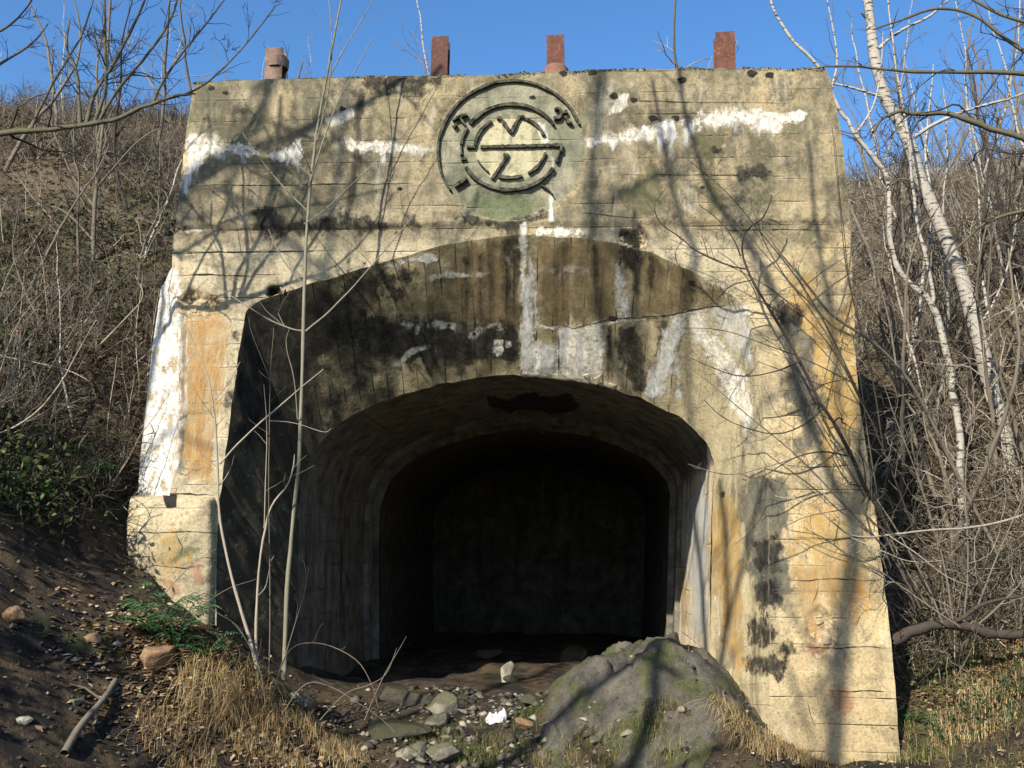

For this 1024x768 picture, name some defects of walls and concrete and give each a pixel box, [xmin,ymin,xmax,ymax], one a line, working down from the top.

water stain [176,133,303,225]
water stain [251,89,433,239]
water stain [587,108,807,150]
water stain [737,163,771,181]
water stain [394,192,753,446]
crack [461,253,747,376]
rust [179,312,228,482]
spalling [488,393,579,414]
spalling [163,488,177,508]
water stain [739,474,796,683]
rust [789,498,875,640]